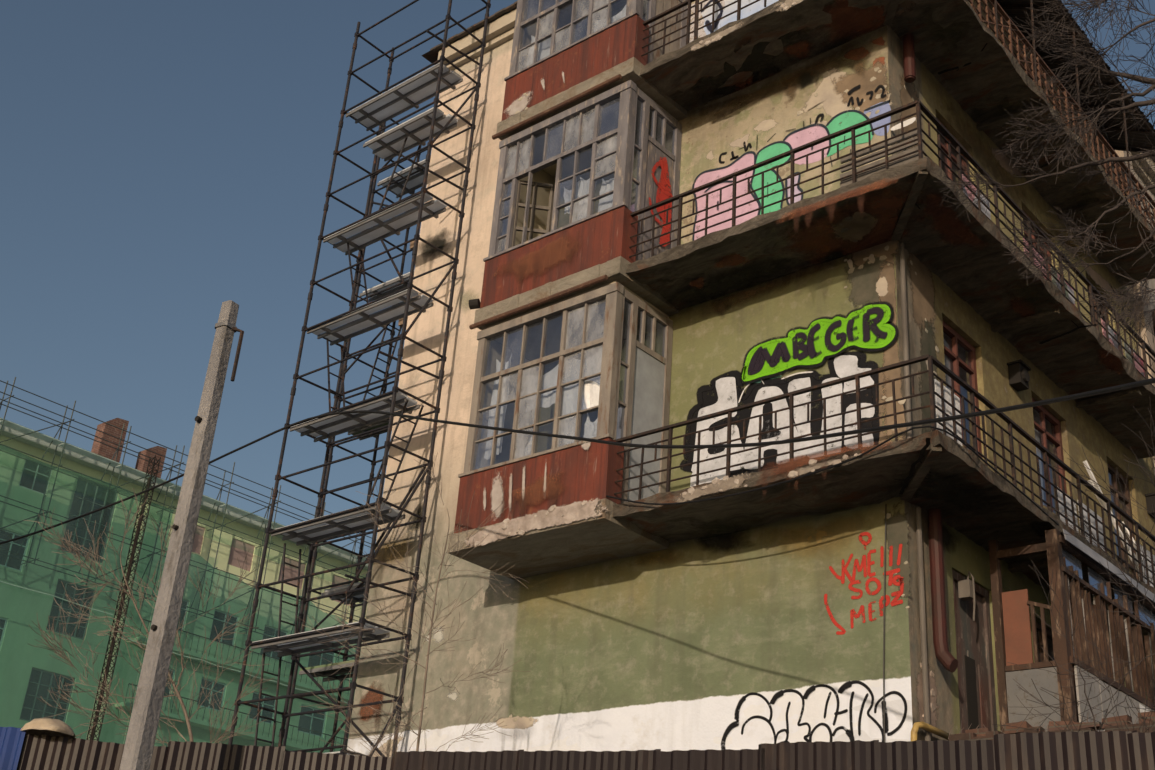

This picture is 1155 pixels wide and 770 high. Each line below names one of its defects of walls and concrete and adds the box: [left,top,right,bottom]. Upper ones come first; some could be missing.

peeling [506,79,545,115]
flaking render [797,37,922,146]
spalling [461,466,608,548]